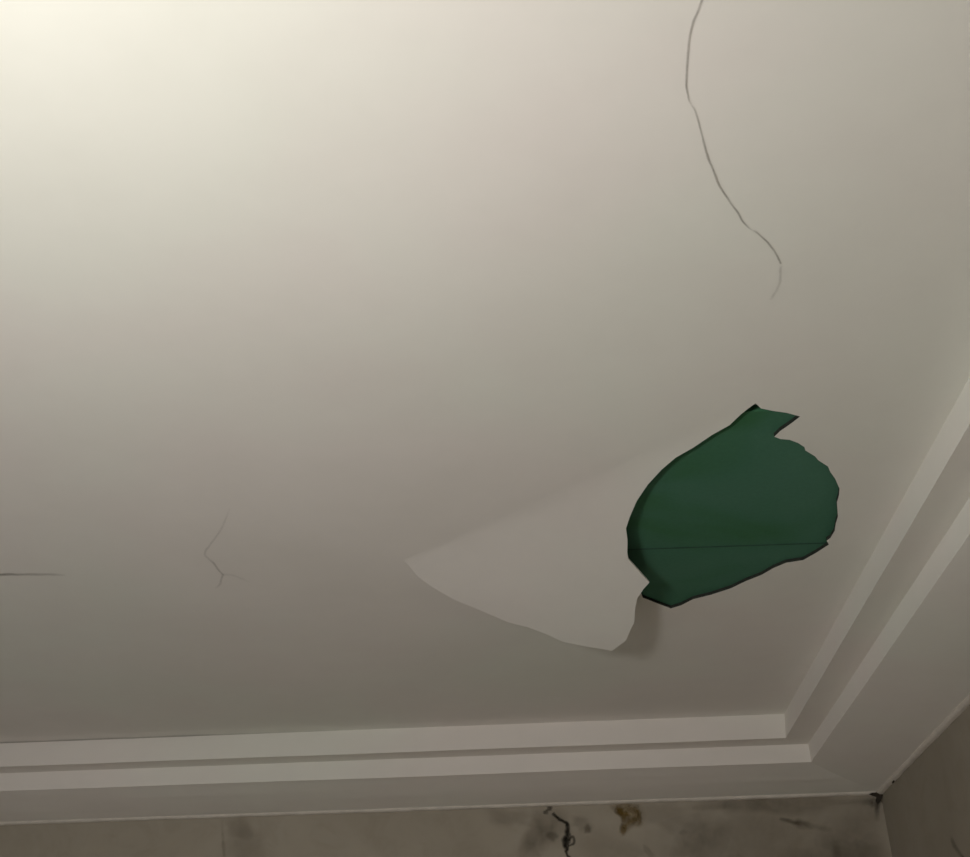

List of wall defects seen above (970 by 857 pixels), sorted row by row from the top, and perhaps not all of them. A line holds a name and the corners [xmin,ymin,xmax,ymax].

peeling [403,404,839,651]